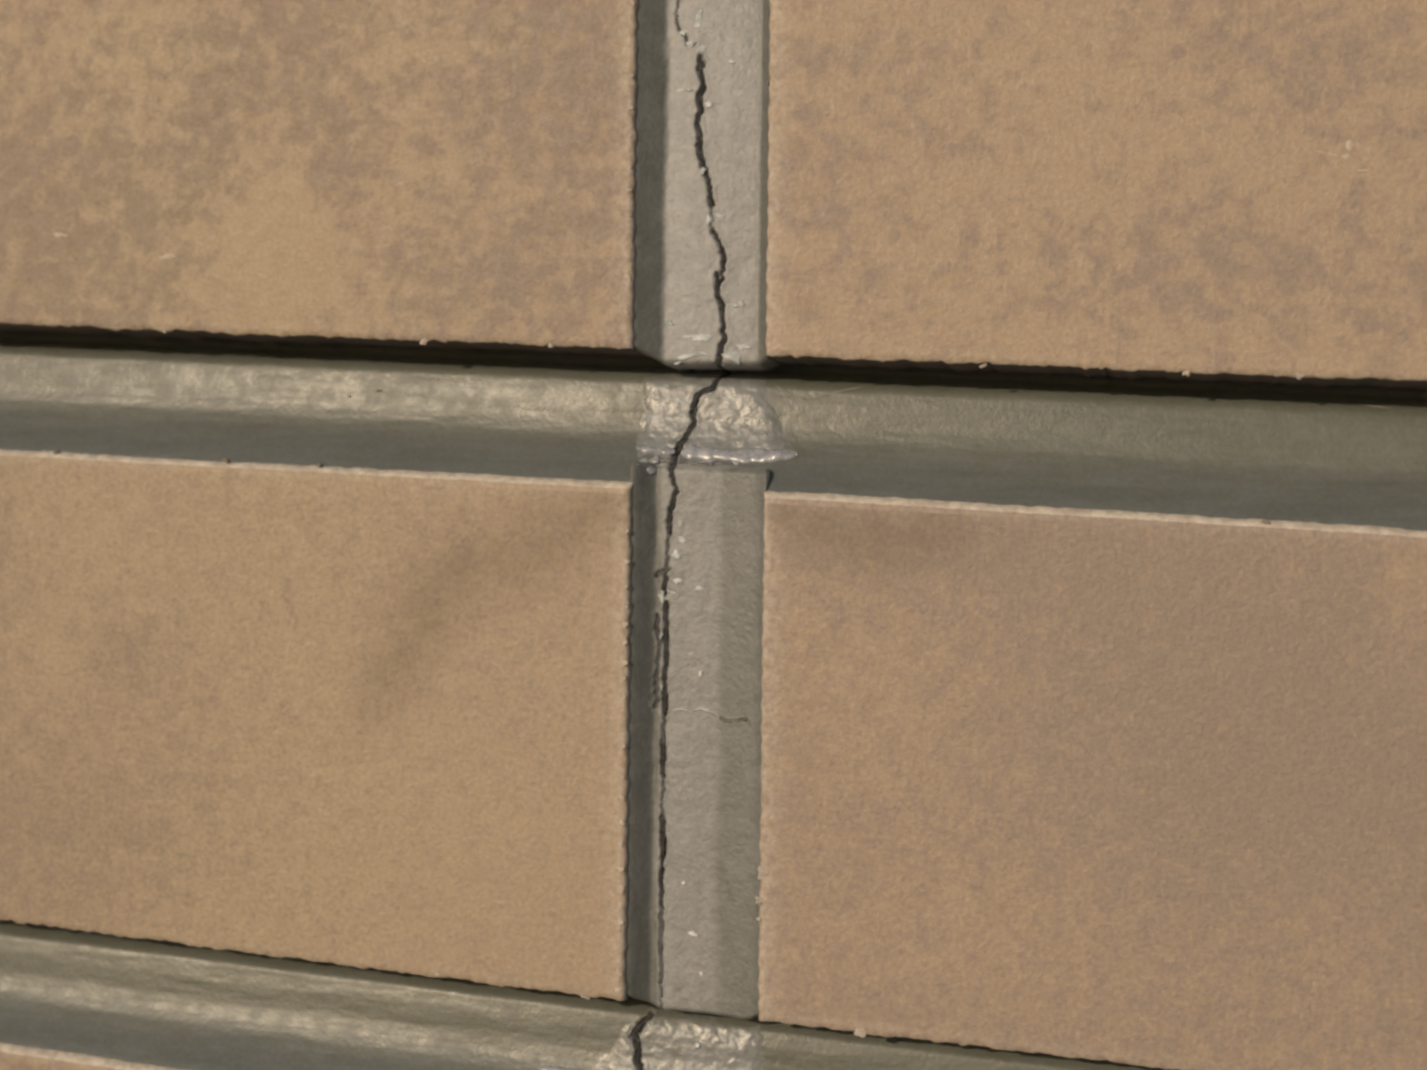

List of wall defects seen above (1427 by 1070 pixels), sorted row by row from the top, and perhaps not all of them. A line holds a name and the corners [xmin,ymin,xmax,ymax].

crack [630,0,746,1070]